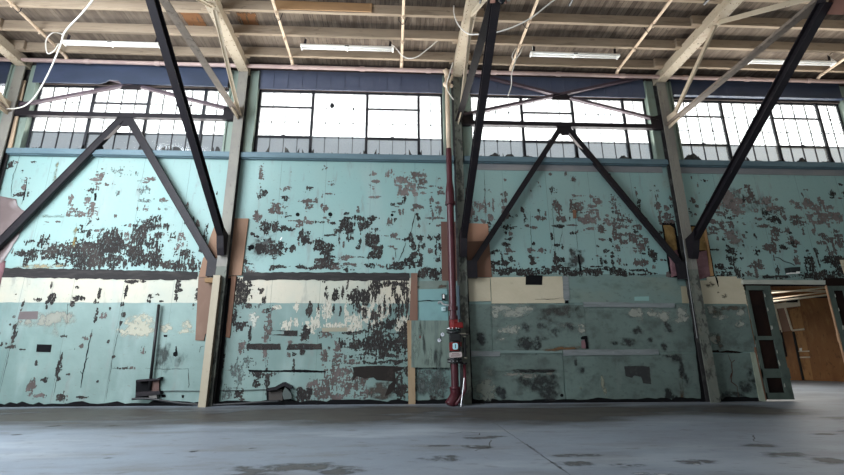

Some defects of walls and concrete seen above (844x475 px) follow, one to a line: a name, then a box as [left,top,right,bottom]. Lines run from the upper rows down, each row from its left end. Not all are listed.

peeling [5,160,32,197]
peeling [0,282,57,350]
peeling [11,166,209,333]
peeling [222,163,445,402]
peeling [699,183,844,280]
peeling [25,352,89,404]
leakage [237,464,354,475]